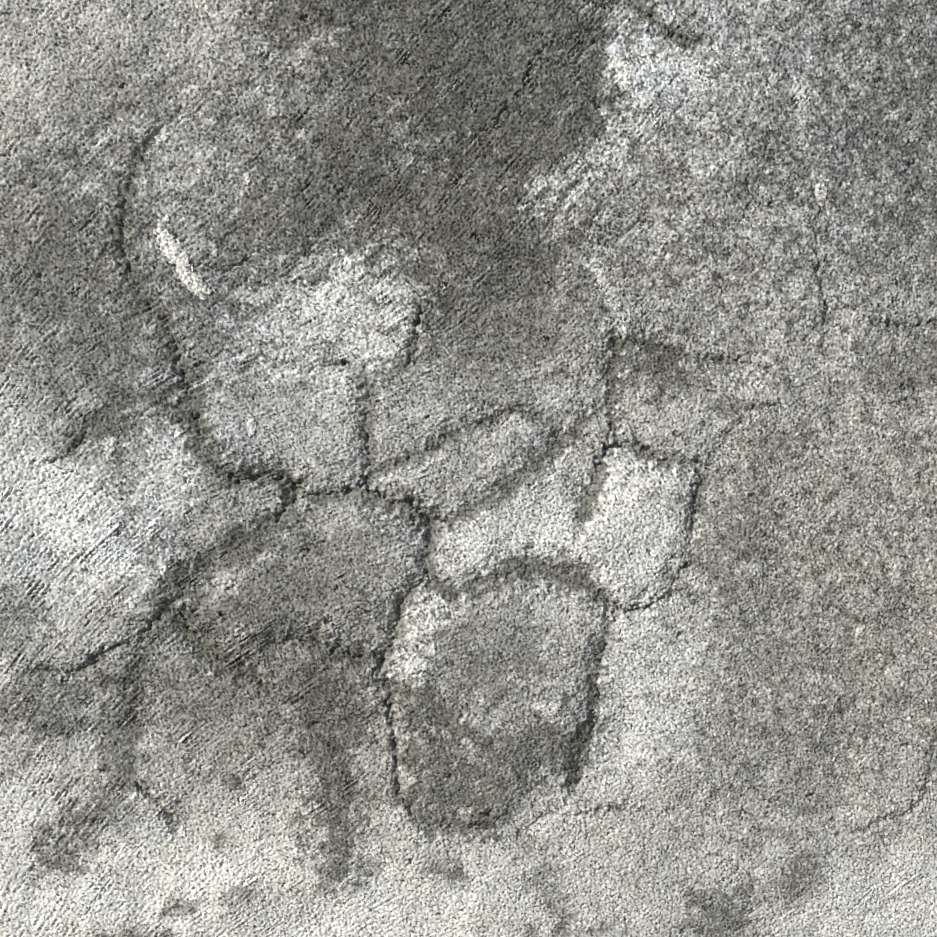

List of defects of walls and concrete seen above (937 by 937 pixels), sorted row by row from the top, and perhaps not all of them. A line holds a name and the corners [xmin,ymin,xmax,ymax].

damp [0,0,228,901]
crack [17,91,788,848]
damp [132,0,723,449]
damp [139,423,937,937]